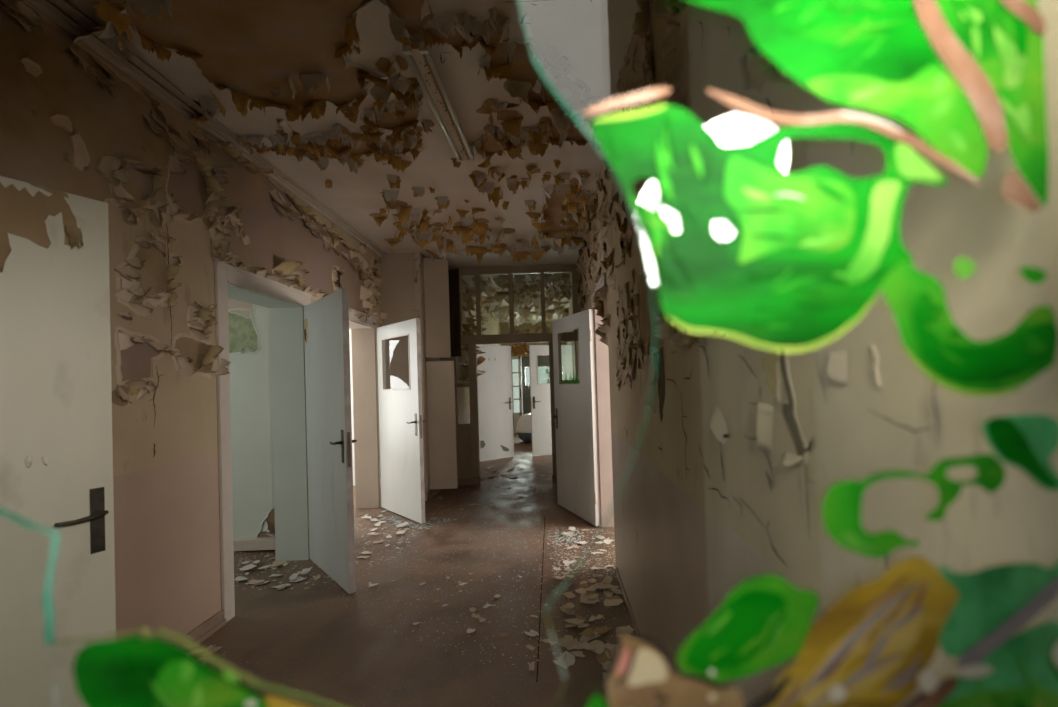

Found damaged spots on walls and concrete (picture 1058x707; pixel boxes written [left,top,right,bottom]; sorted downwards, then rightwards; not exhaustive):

peeling [0,0,721,425]
crack [658,336,787,566]